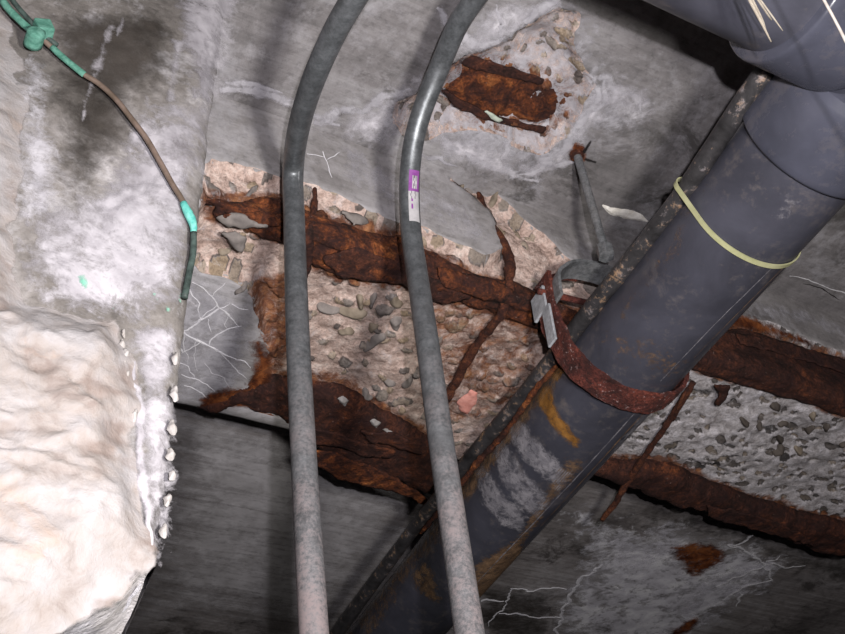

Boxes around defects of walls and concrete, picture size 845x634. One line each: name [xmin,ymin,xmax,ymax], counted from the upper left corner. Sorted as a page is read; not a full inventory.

corrosion [441,50,560,134]
water stain [0,0,294,634]
crack [180,282,251,398]
spalling [194,159,287,377]
spalling [307,265,427,435]
corrosion [424,225,541,404]
spalling [432,300,550,460]
spalling [610,369,845,521]
corrosion [692,316,845,417]
water stain [481,590,544,633]
crack [481,565,602,634]
water stain [556,513,782,634]